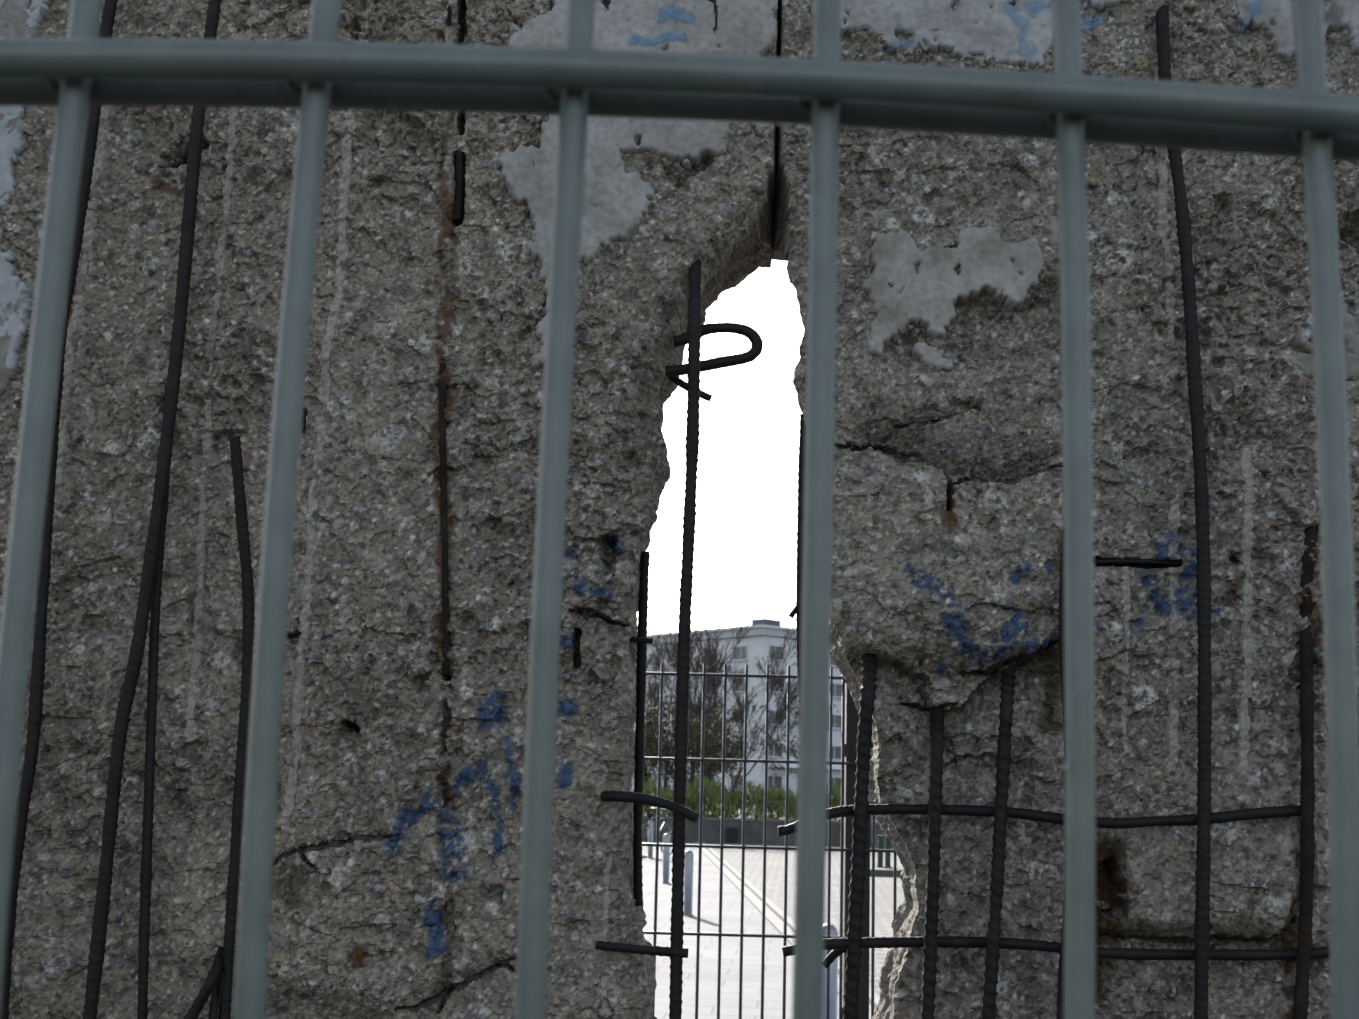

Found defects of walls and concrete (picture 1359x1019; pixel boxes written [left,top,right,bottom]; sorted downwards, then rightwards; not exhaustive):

spalling [83,107,206,1019]
crack [273,832,396,871]
corrosion [436,699,453,822]
corrosion [431,112,463,676]
crack [394,956,517,1014]
spalling [572,249,763,1019]
spalling [788,414,805,692]
crack [834,442,850,450]
spalling [824,530,1069,1019]
crack [951,465,1063,485]
corrosion [1095,839,1131,1000]
spalling [1095,148,1330,1019]